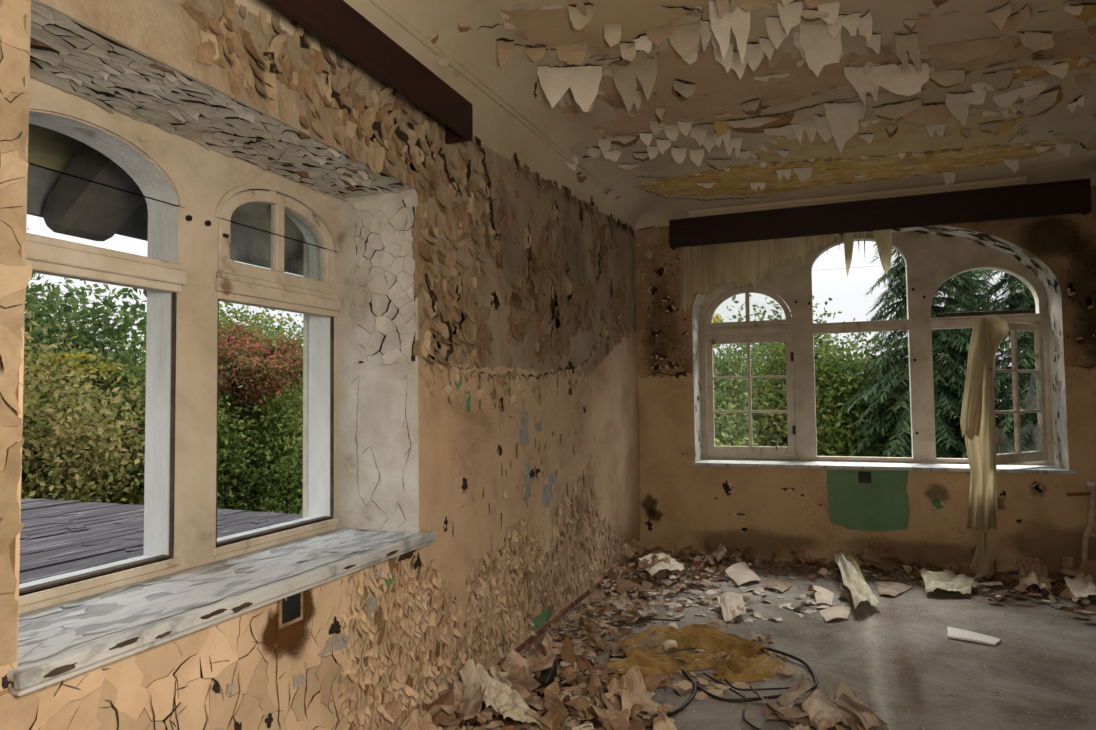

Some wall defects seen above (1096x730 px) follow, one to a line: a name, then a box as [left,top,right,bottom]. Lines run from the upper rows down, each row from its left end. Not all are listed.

crack [0,0,767,730]
peeling [30,0,1096,508]
crack [621,91,887,136]
damp [1028,219,1096,353]